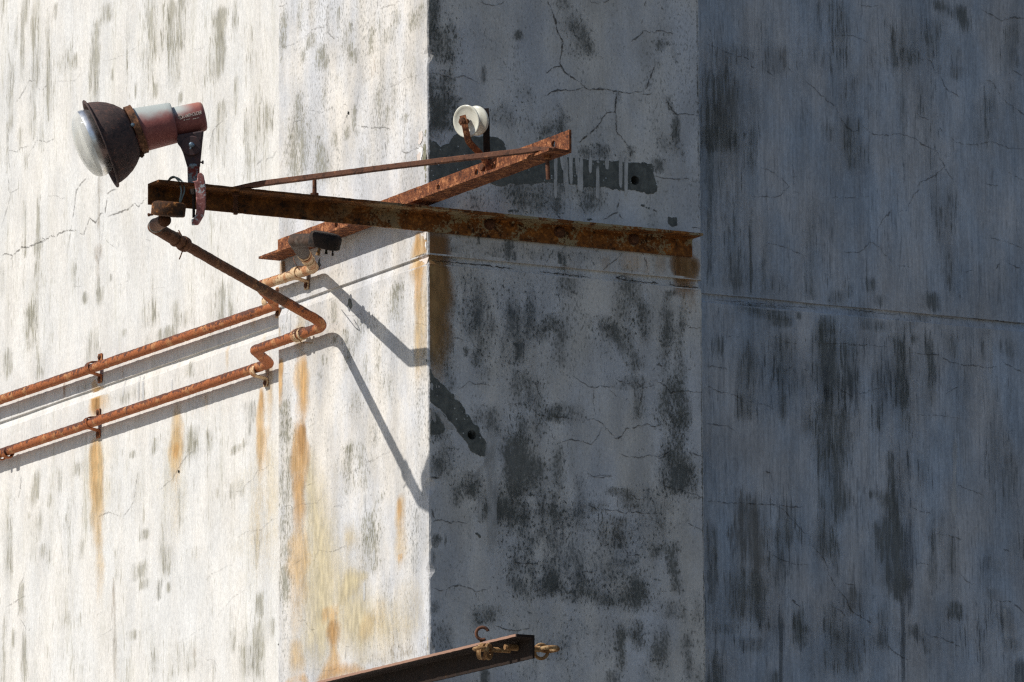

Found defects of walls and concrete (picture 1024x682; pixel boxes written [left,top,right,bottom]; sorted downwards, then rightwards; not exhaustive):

crack [547,2,694,156]
crack [3,180,143,256]
corrosion [671,256,699,290]
corrosion [91,381,101,412]
corrosion [296,362,307,404]
corrosion [91,443,102,521]
corrosion [292,424,308,515]
damp [662,403,694,494]
damp [818,388,848,514]
damp [621,559,650,611]
corrosion [323,615,356,676]
damp [634,625,669,664]